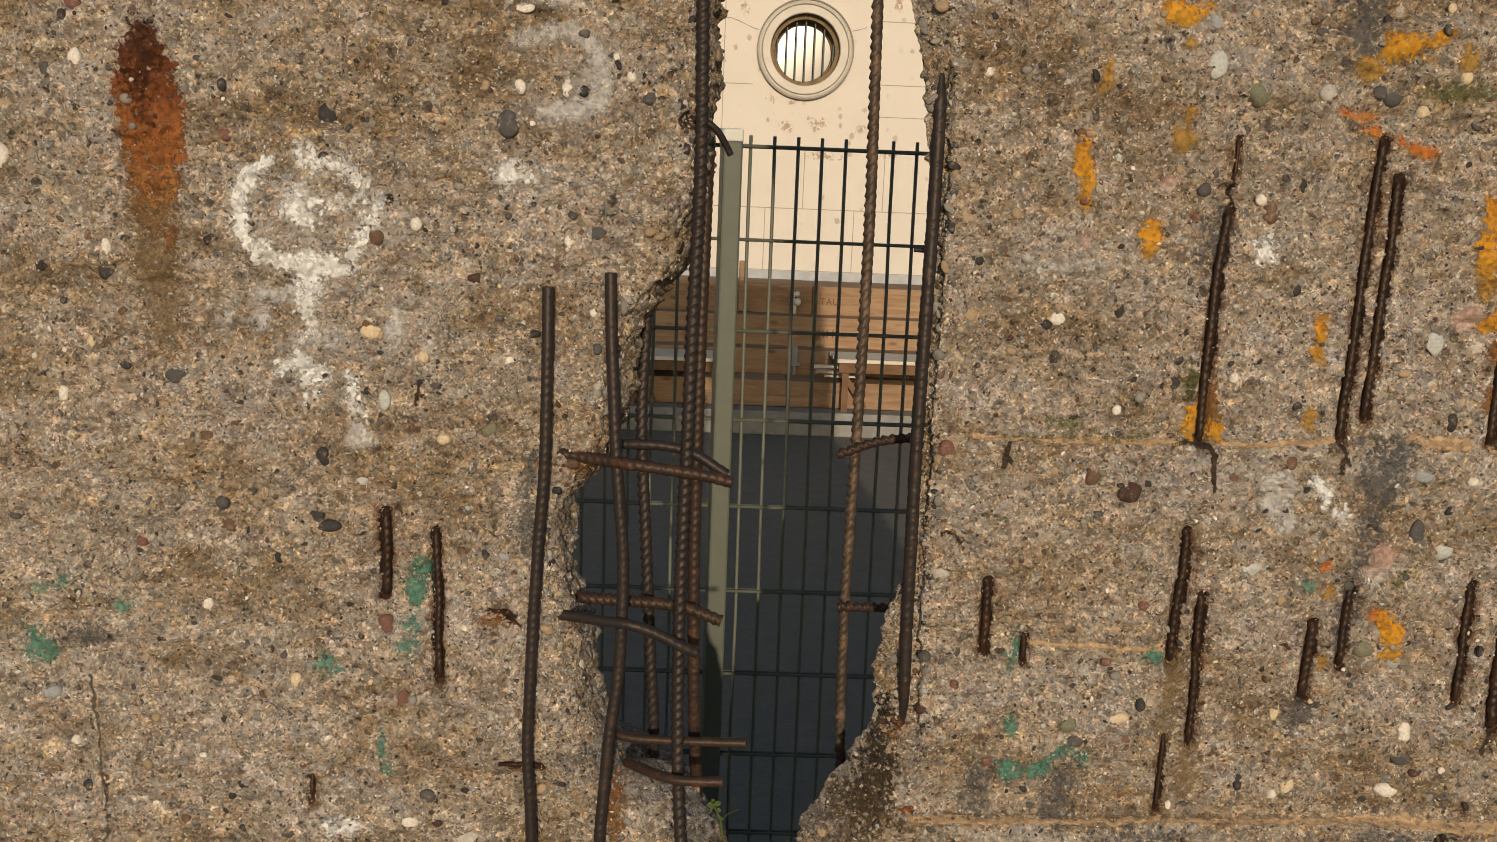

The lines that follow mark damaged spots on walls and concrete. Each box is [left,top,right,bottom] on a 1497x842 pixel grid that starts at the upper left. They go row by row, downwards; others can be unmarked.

corrosion [107,12,190,362]
spalling [472,0,747,842]
spalling [834,0,947,769]
corrosion [606,758,628,842]
corrosion [1151,532,1209,812]